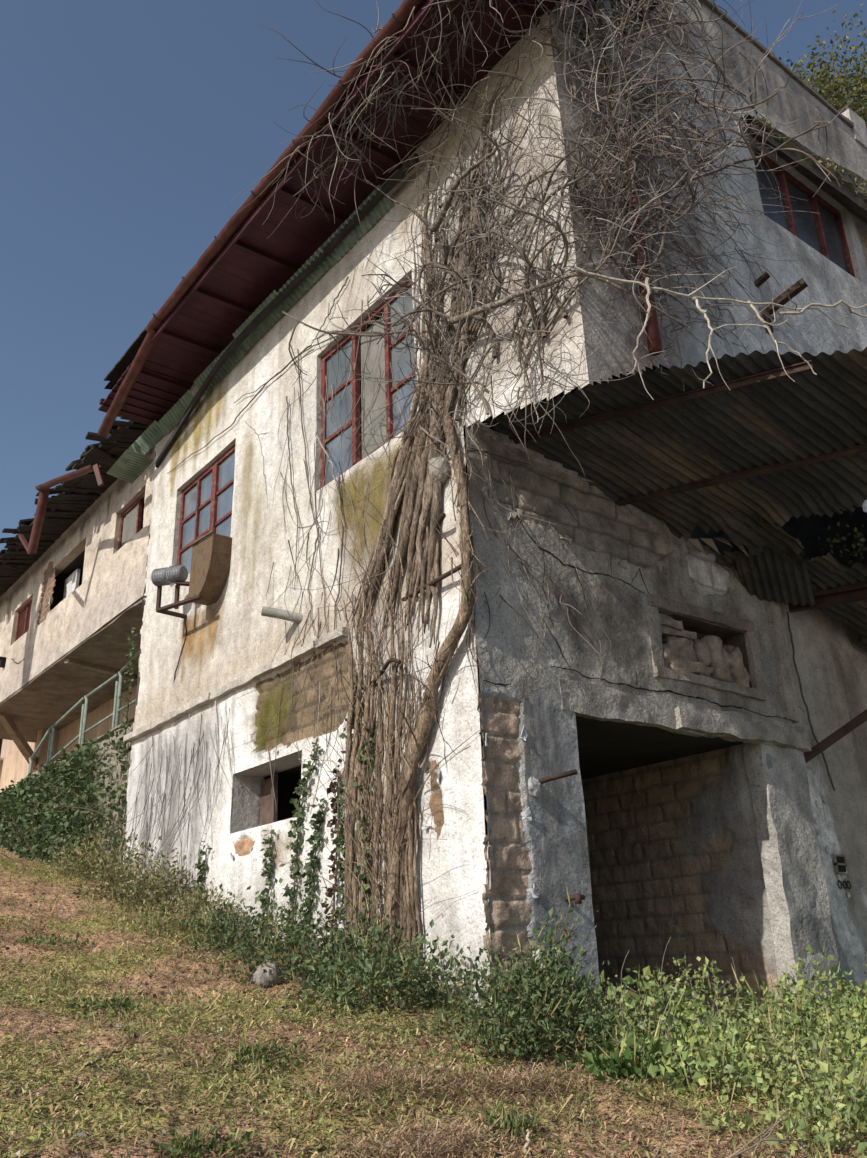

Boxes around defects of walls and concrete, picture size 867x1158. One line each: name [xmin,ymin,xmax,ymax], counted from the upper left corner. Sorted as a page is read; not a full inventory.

leakage [170,385,221,490]
spalling [485,436,735,596]
crack [517,517,804,719]
spalling [250,641,358,756]
spalling [230,838,255,860]
flaking render [421,756,444,840]
spalling [477,690,542,1004]